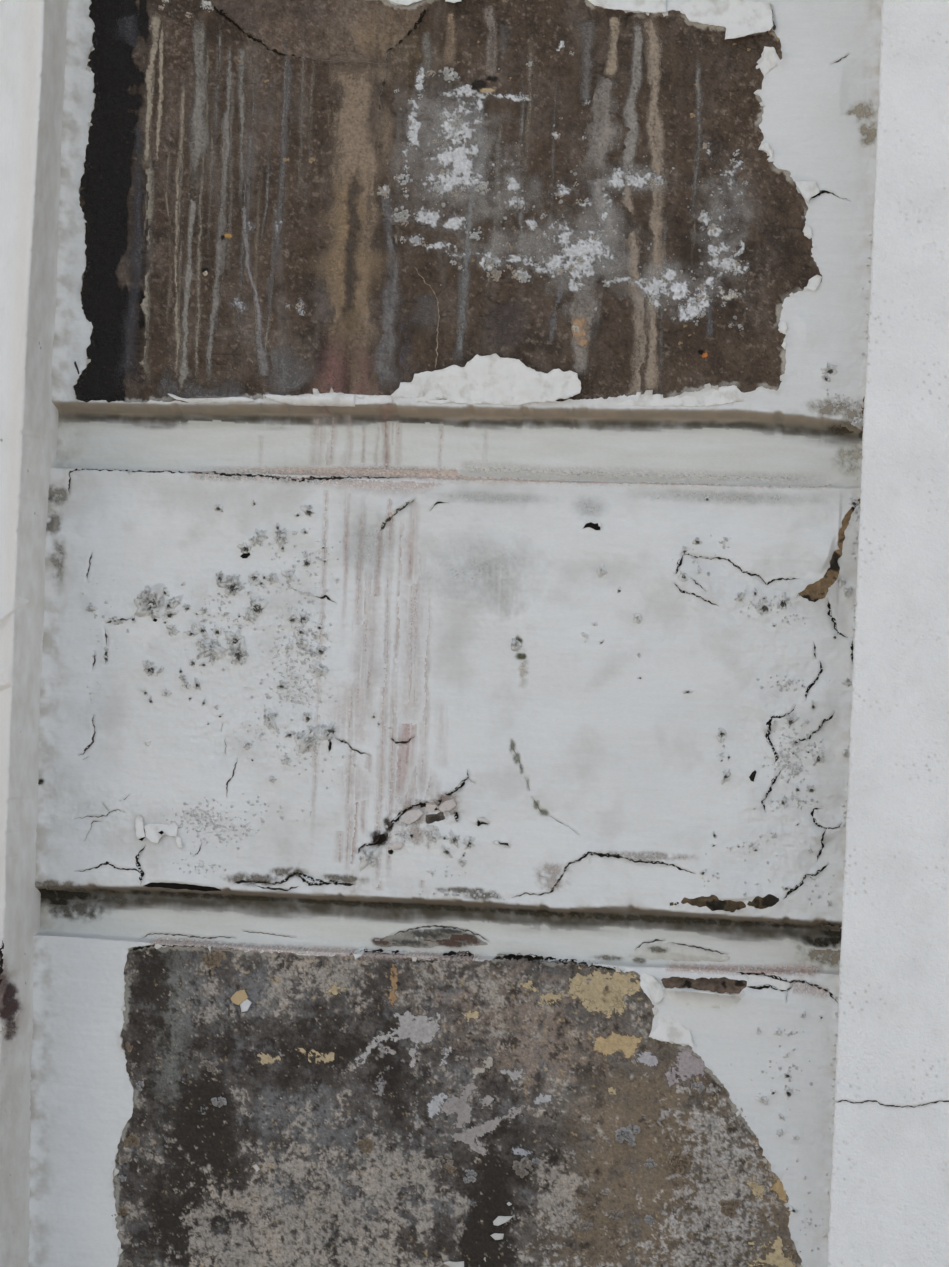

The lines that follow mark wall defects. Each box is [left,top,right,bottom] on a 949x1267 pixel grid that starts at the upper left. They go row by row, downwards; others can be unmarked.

crack [211,5,427,123]
damp [73,0,749,403]
peeling [115,0,822,407]
crack [674,554,798,606]
crack [761,603,854,810]
crack [80,795,145,885]
crack [235,872,355,891]
crack [358,771,483,853]
crack [511,743,695,898]
crack [784,808,842,899]
peeling [109,928,803,1267]
crack [838,1100,949,1108]